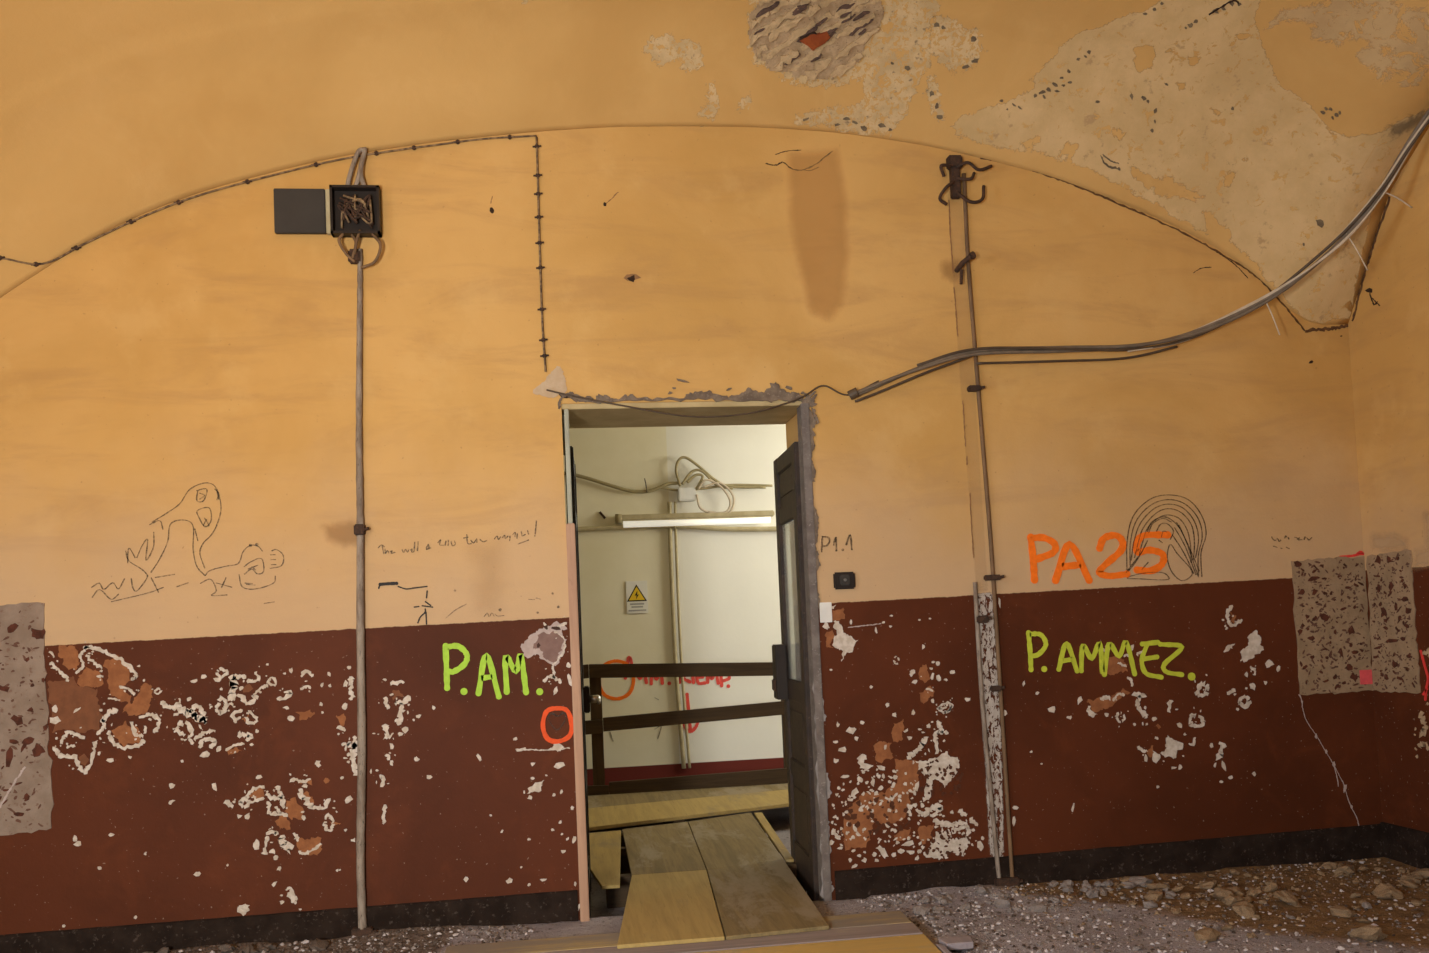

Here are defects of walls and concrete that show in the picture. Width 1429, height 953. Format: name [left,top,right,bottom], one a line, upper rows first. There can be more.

peeling [643,33,704,73]
peeling [746,0,1426,323]
spalling [558,379,821,570]
peeling [0,610,436,910]
peeling [521,616,572,695]
peeling [523,762,576,853]
peeling [818,593,893,671]
peeling [812,644,984,898]
peeling [1067,644,1233,783]
peeling [1222,605,1280,711]
spalling [1294,553,1429,693]
peeling [1414,702,1429,758]